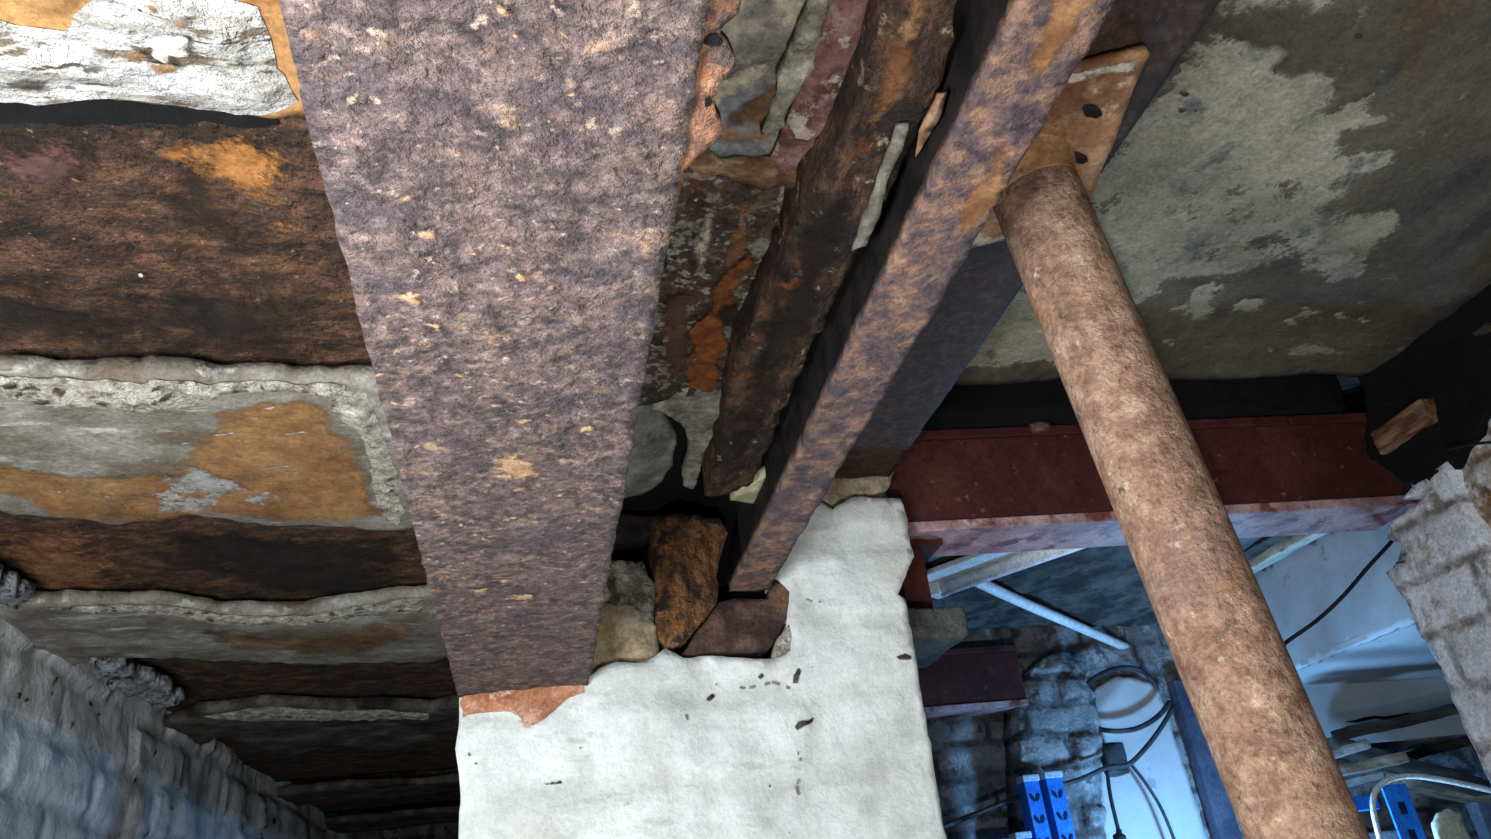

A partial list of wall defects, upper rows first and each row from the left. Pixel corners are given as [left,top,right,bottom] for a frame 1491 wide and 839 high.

rust [870,0,927,122]
rust [1030,0,1092,75]
rust [672,0,776,219]
rust [163,136,281,205]
rust [959,150,1007,233]
rust [418,231,435,240]
rust [398,292,420,306]
rust [491,451,539,492]
rust [461,576,533,600]